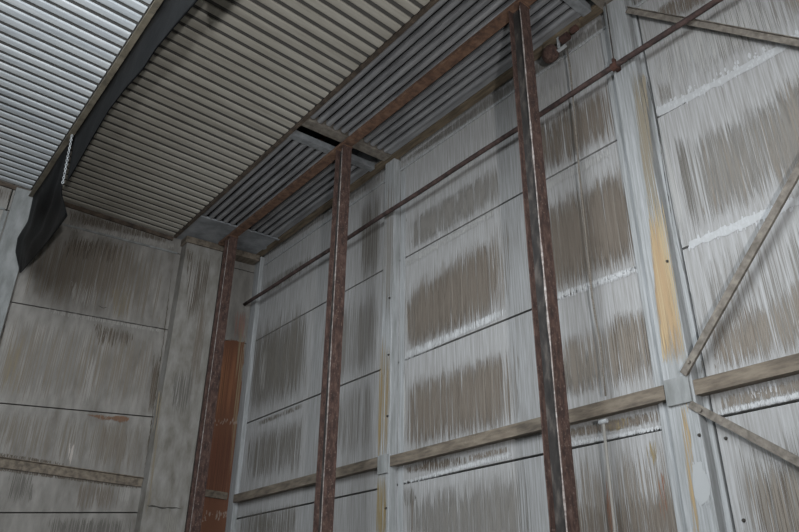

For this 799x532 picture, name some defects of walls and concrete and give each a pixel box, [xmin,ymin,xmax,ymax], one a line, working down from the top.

leakage [631,0,799,251]
rust [200,340,245,532]
leakage [262,148,534,532]
leakage [519,6,637,532]
rust [646,188,686,366]
leakage [700,223,799,373]